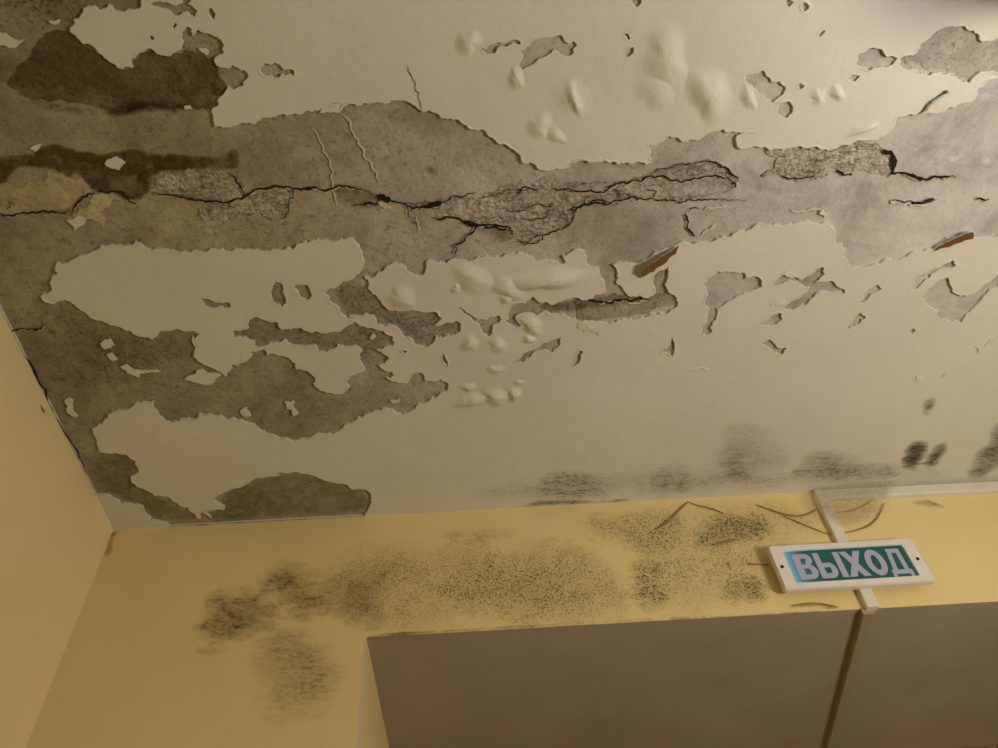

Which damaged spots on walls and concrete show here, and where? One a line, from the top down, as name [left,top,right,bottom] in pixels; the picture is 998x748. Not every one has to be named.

water stain [0,145,238,199]
crack [782,169,852,181]
crack [883,149,957,207]
crack [0,161,748,256]
peeling [0,0,998,526]
water stain [902,443,944,467]
water stain [697,518,765,544]
water stain [368,552,622,618]